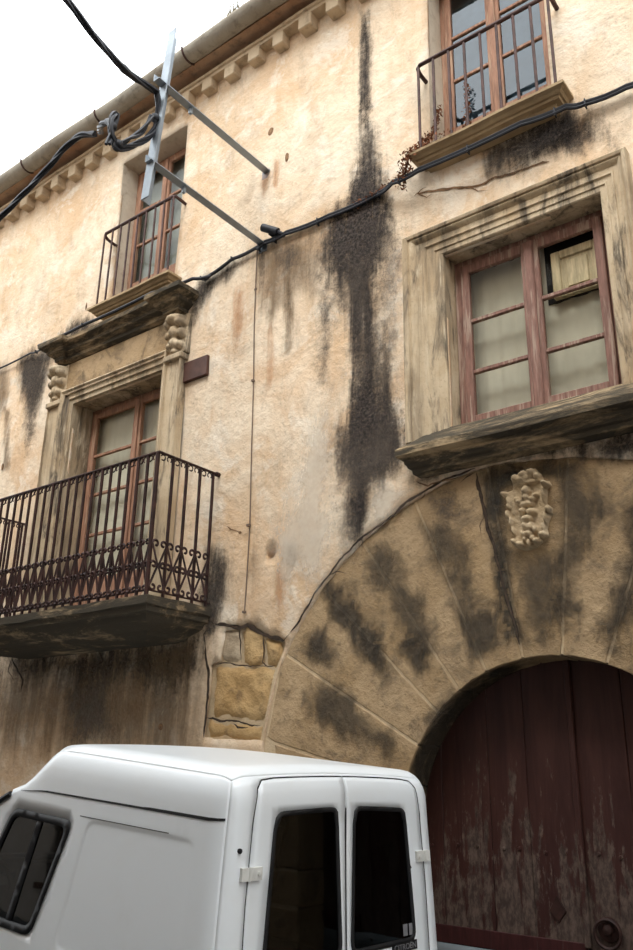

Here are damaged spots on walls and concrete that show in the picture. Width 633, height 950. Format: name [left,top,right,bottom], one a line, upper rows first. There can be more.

crack [415,161,549,198]
water stain [483,110,595,177]
water stain [259,15,405,577]
water stain [20,347,50,440]
water stain [1,637,197,743]
water stain [203,547,227,631]
water stain [307,630,331,660]
water stain [303,686,394,755]
water stain [323,582,386,673]
water stain [369,547,430,672]
water stain [413,666,522,795]
water stain [427,433,633,658]